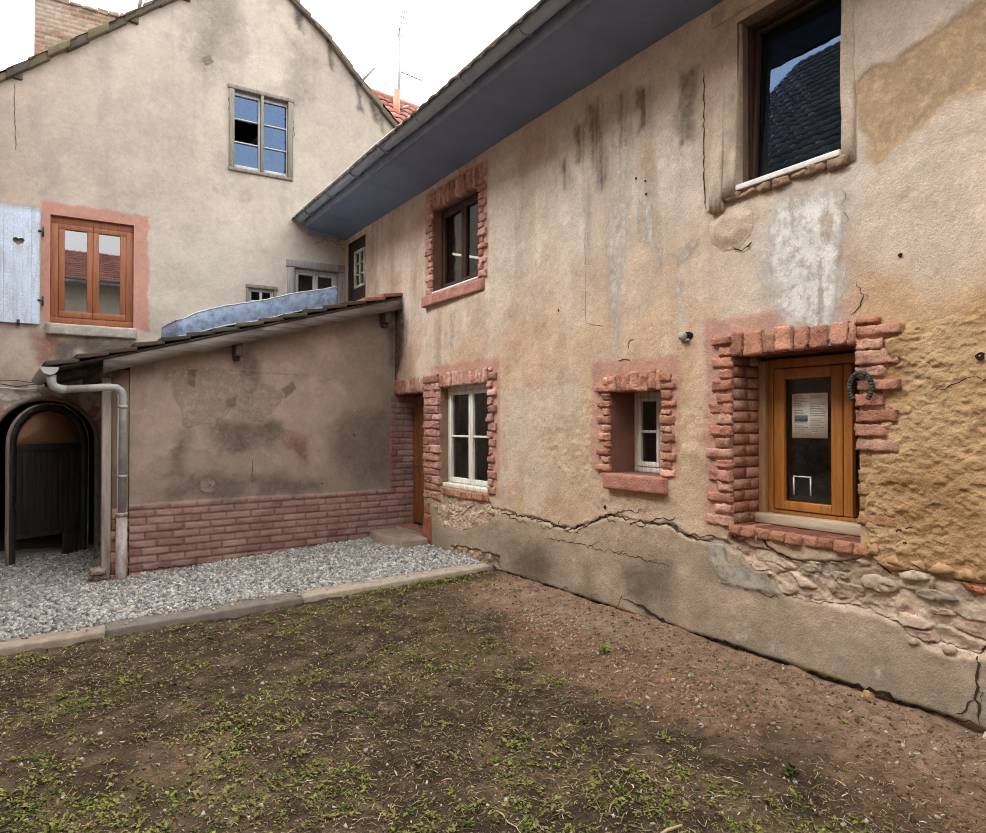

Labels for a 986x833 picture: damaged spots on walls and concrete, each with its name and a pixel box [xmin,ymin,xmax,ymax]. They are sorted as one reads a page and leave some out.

leakage [636,89,646,127]
peeling [760,187,846,346]
crack [933,376,986,392]
flaking render [722,294,986,655]
spalling [434,492,495,531]
spalling [450,544,500,568]
crack [496,509,721,566]